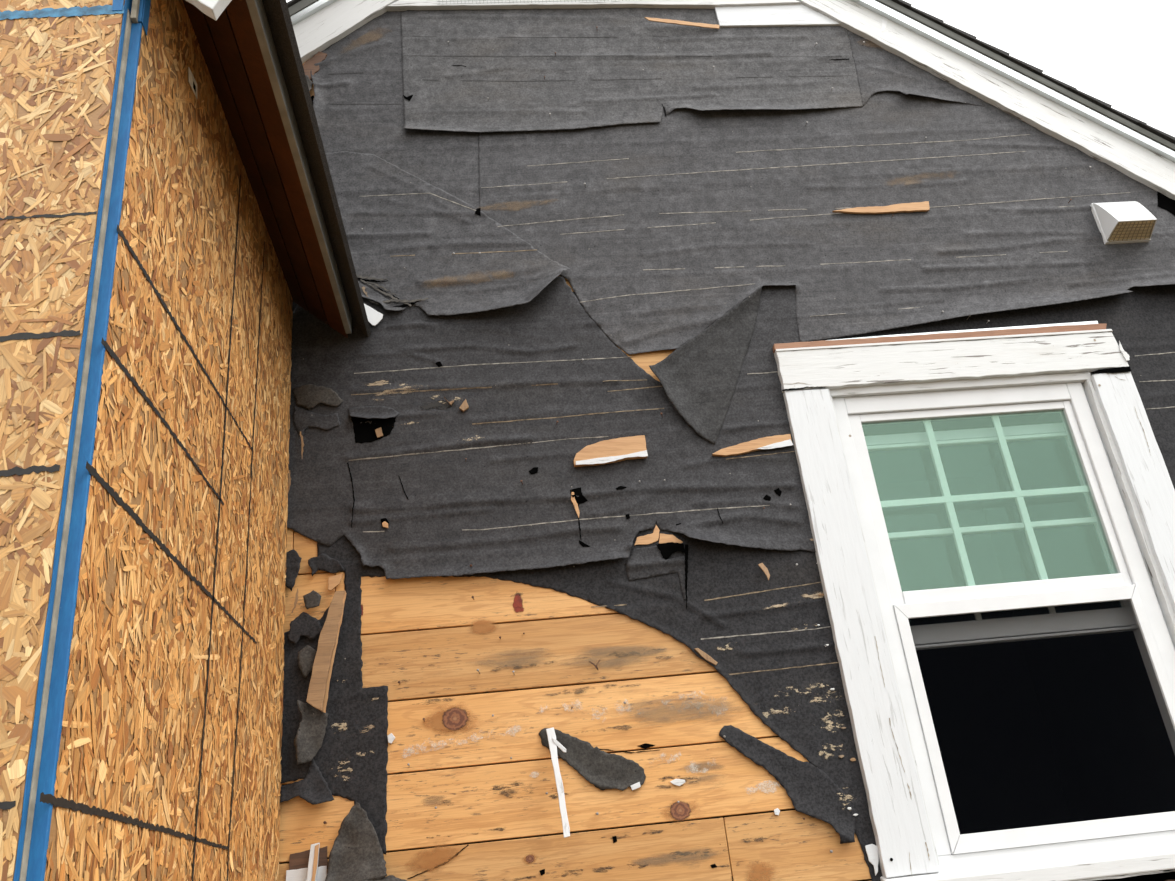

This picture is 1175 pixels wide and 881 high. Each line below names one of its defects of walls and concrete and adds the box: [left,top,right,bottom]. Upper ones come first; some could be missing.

peeling [367,380,419,400]
peeling [420,395,469,412]
damp [586,647,681,666]
peeling [763,681,856,761]
peeling [865,844,879,876]